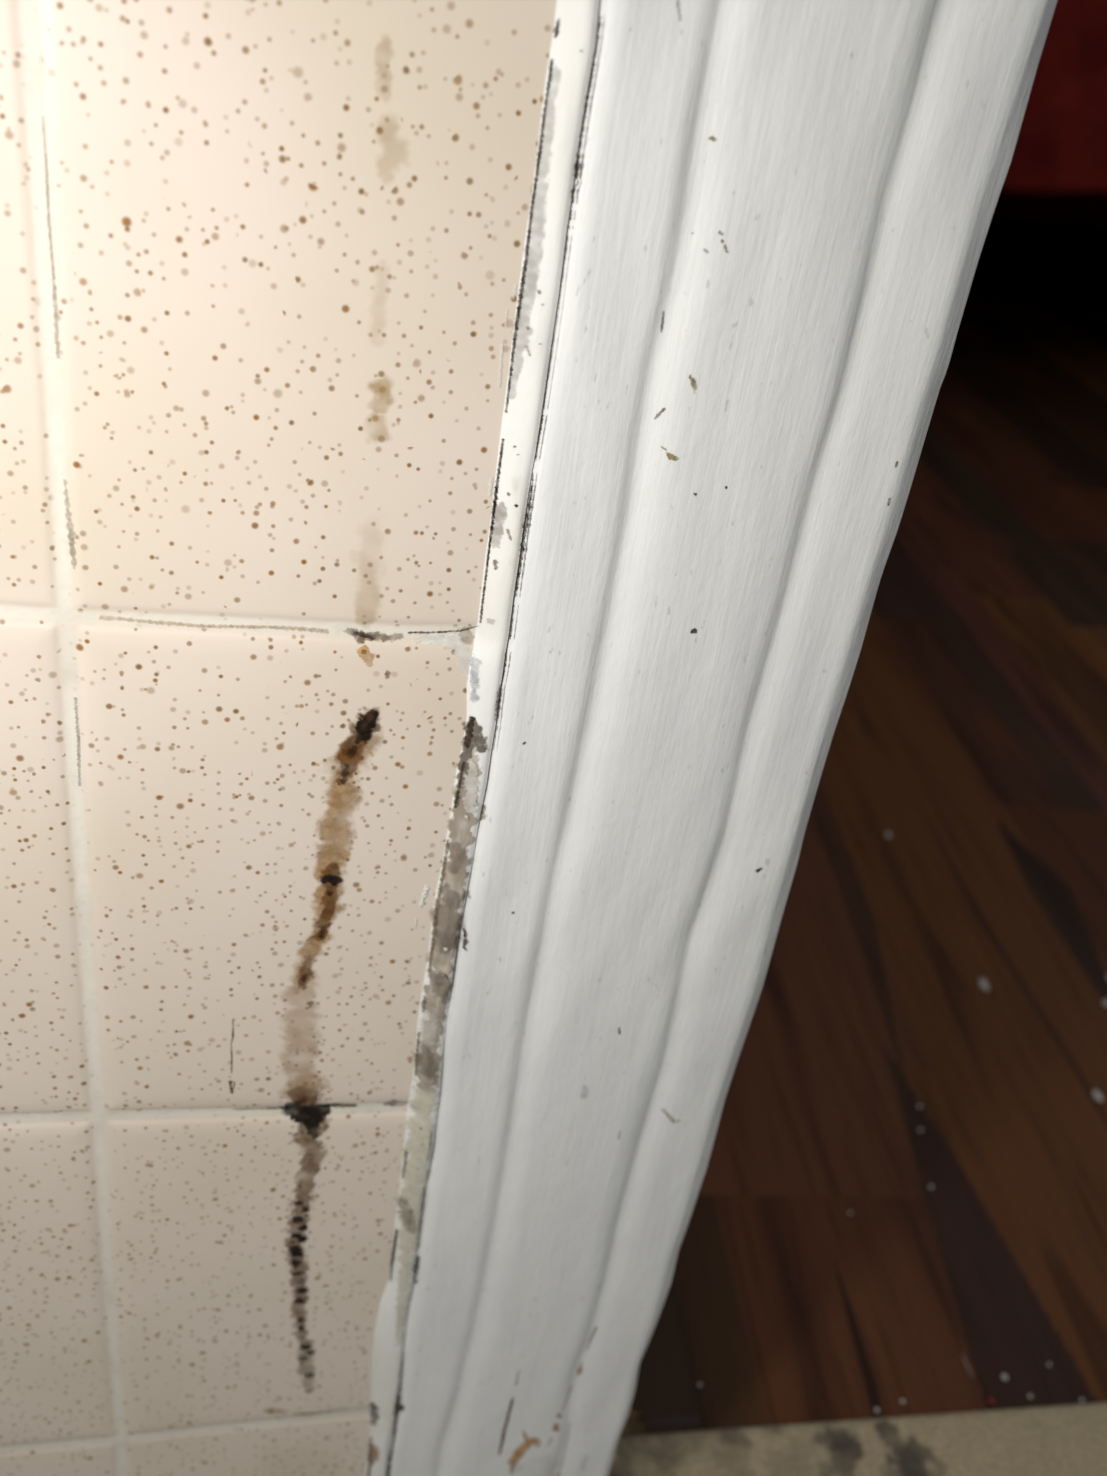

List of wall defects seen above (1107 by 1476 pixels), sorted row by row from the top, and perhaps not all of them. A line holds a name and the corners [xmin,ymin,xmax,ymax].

rust [294,709,380,989]
peeling [508,1431,540,1474]
leakage [826,1426,862,1470]
leakage [876,1420,928,1476]